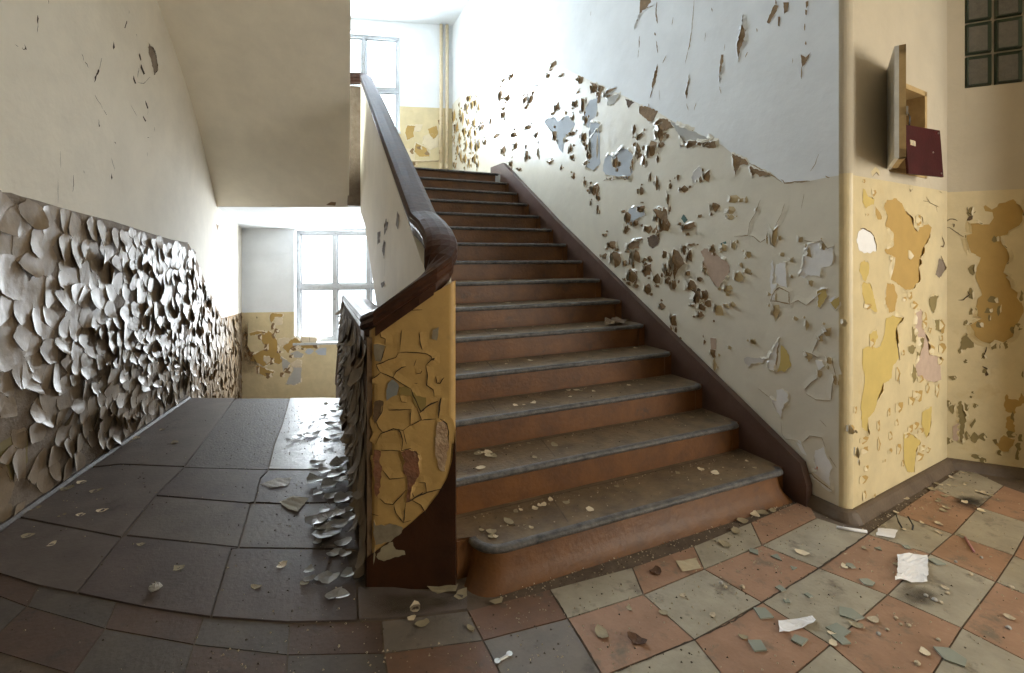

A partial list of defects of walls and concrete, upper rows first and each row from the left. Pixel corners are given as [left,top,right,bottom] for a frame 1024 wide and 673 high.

peeling [634,0,655,30]
peeling [718,0,789,92]
peeling [792,1,811,78]
peeling [405,56,847,375]
peeling [0,190,426,580]
crack [370,304,456,523]
peeling [796,439,835,495]
peeling [848,179,1024,501]